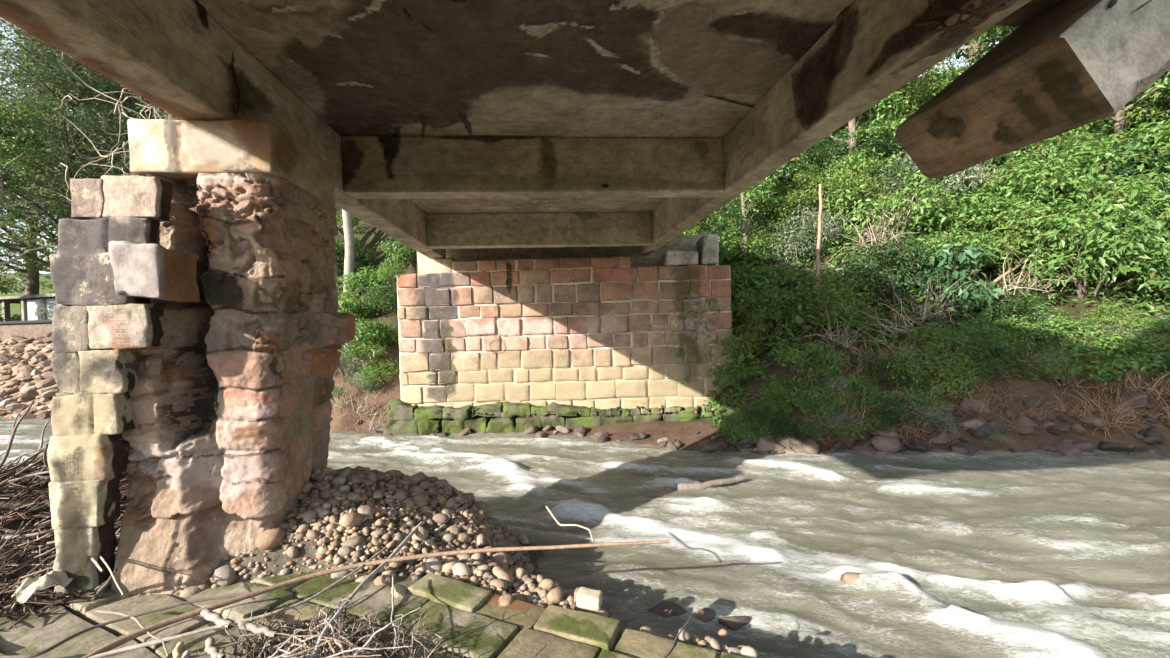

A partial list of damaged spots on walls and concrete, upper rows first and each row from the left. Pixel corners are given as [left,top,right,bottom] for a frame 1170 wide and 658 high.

damp [226,0,688,187]
damp [710,6,857,130]